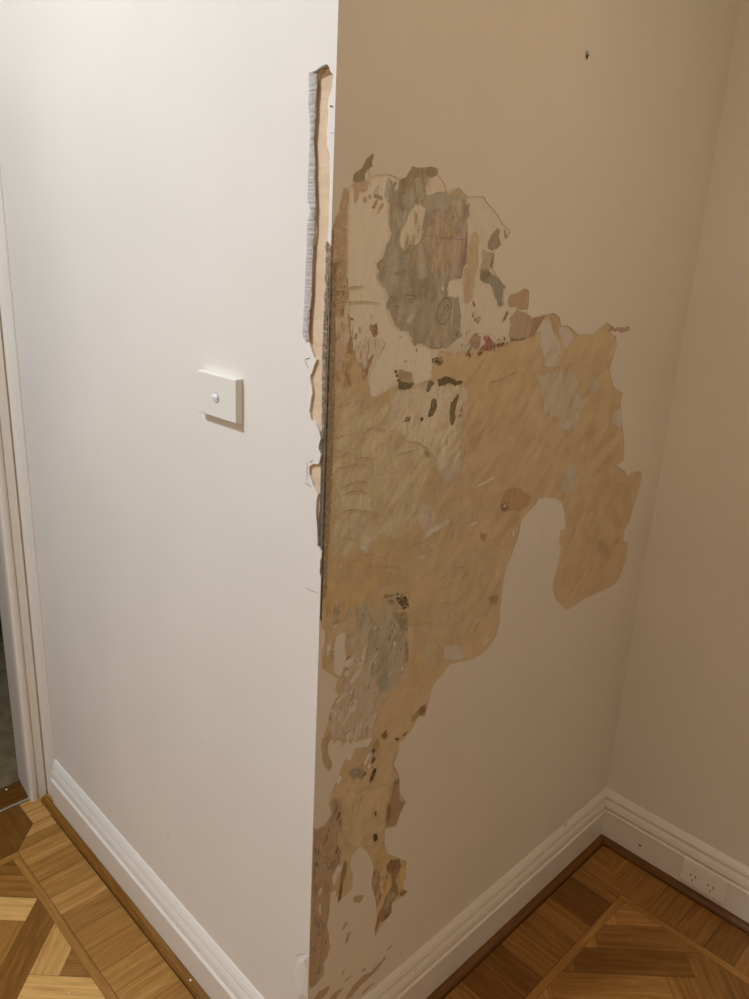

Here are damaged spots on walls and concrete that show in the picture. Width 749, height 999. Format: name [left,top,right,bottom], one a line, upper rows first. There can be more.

peeling [302,64,642,999]